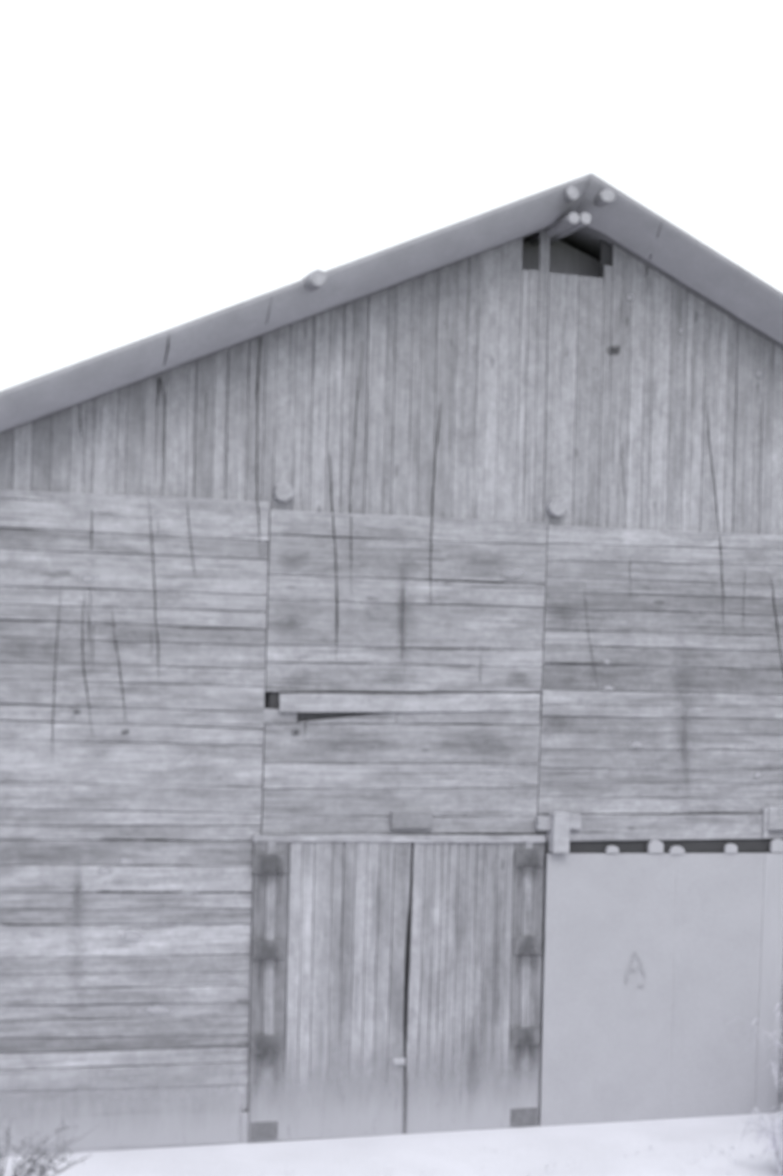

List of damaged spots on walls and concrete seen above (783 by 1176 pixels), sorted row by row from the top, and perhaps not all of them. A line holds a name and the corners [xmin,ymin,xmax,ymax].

crack [52,583,126,753]
crack [149,509,159,670]
crack [157,337,169,478]
crack [329,341,369,651]
crack [401,398,442,662]
crack [707,404,783,667]